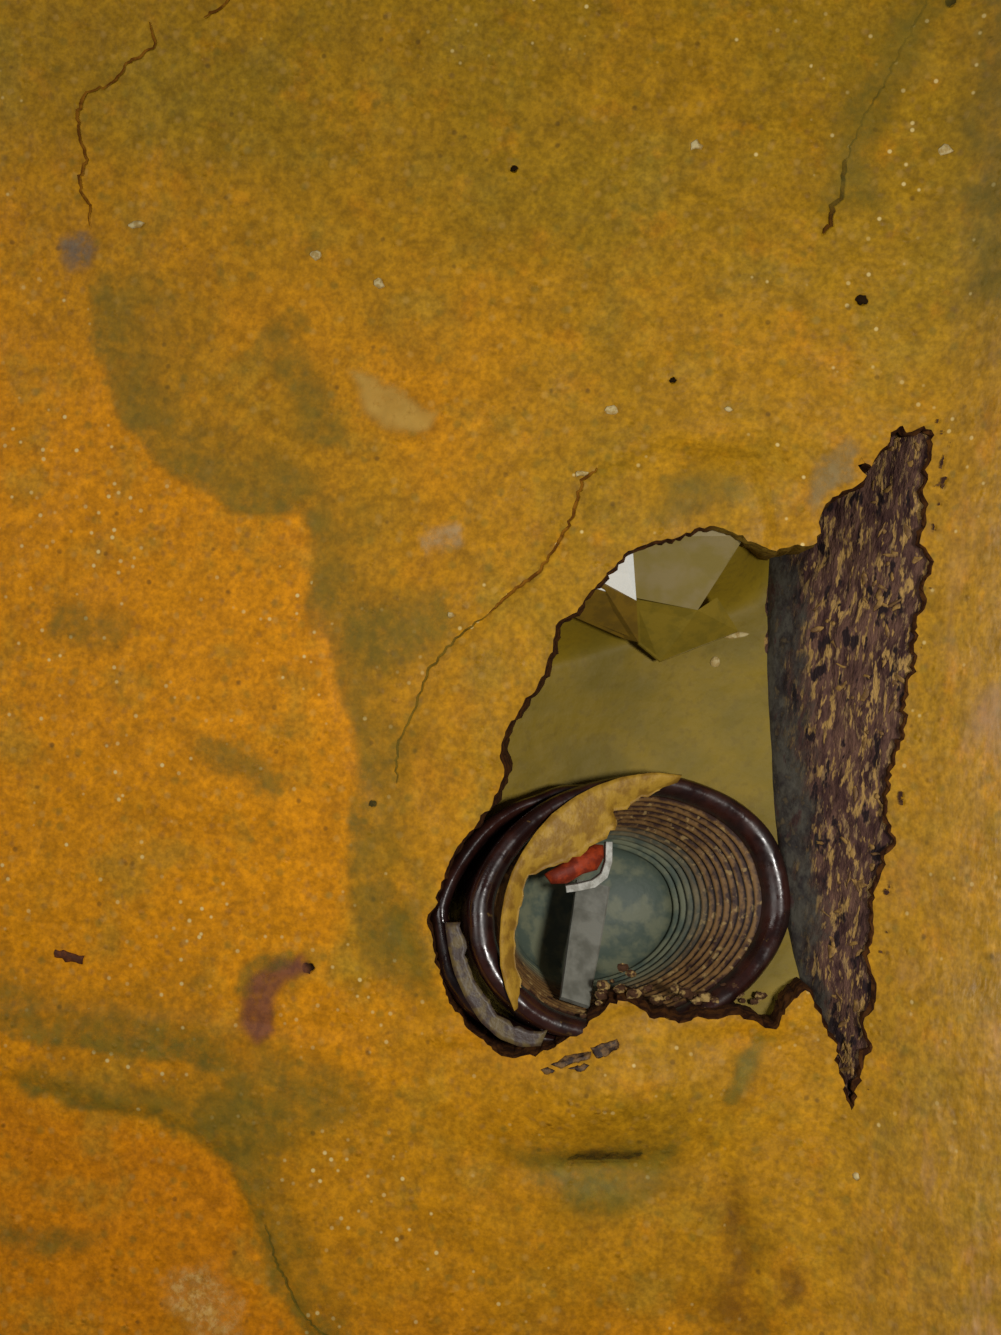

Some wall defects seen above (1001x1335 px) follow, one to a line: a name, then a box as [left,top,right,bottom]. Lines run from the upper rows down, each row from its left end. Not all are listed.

crack [75,23,156,225]
crack [204,0,229,18]
crack [823,0,927,234]
crack [394,468,597,784]
spalling [427,419,951,1110]